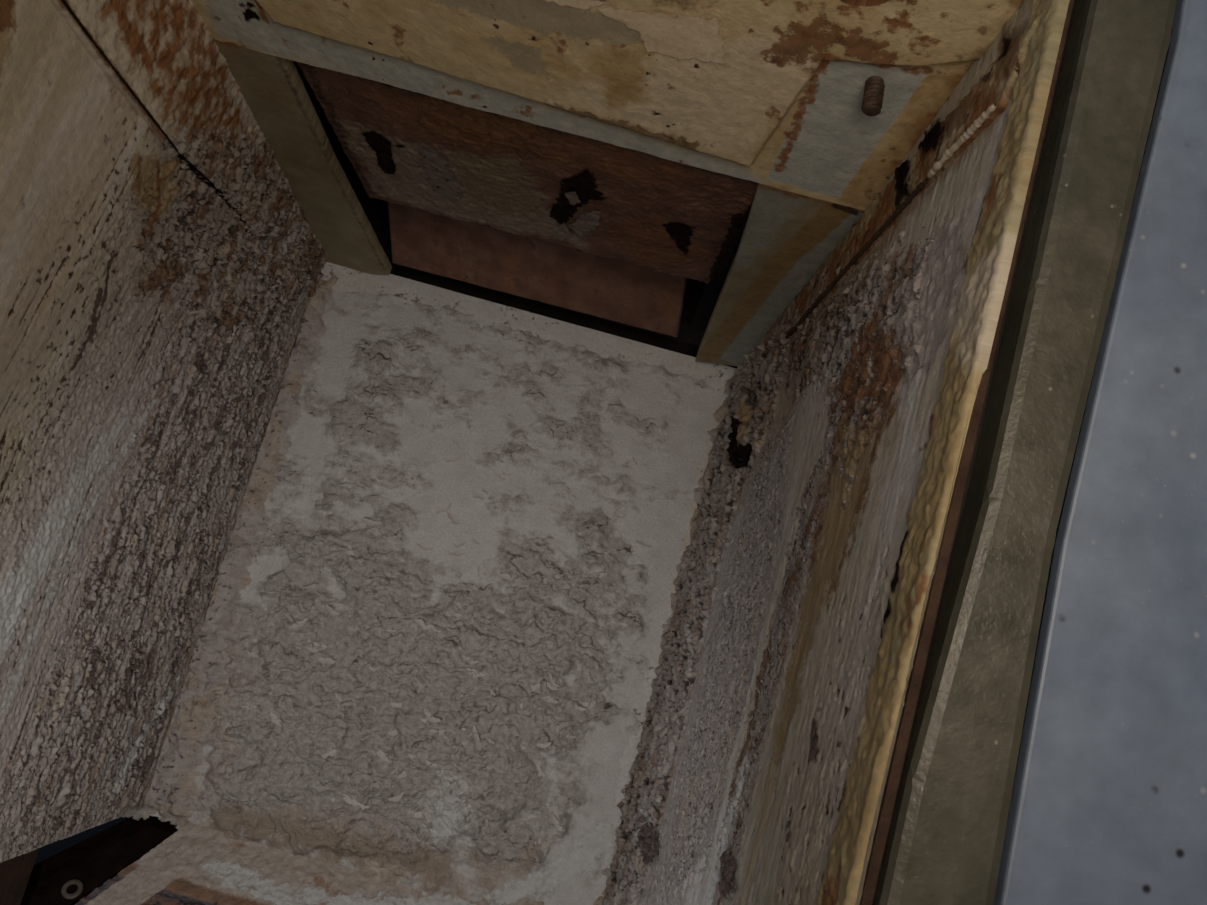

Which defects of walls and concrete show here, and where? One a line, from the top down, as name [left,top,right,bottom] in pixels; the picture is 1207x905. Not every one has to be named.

peeling [544,0,730,66]
corrosion [761,14,898,71]
corrosion [996,22,1026,75]
corrosion [365,78,541,154]
corrosion [544,103,698,151]
peeling [552,191,601,242]
water stain [89,252,113,343]
corrosion [835,306,914,444]
peeling [190,290,793,905]
water stain [705,755,750,905]